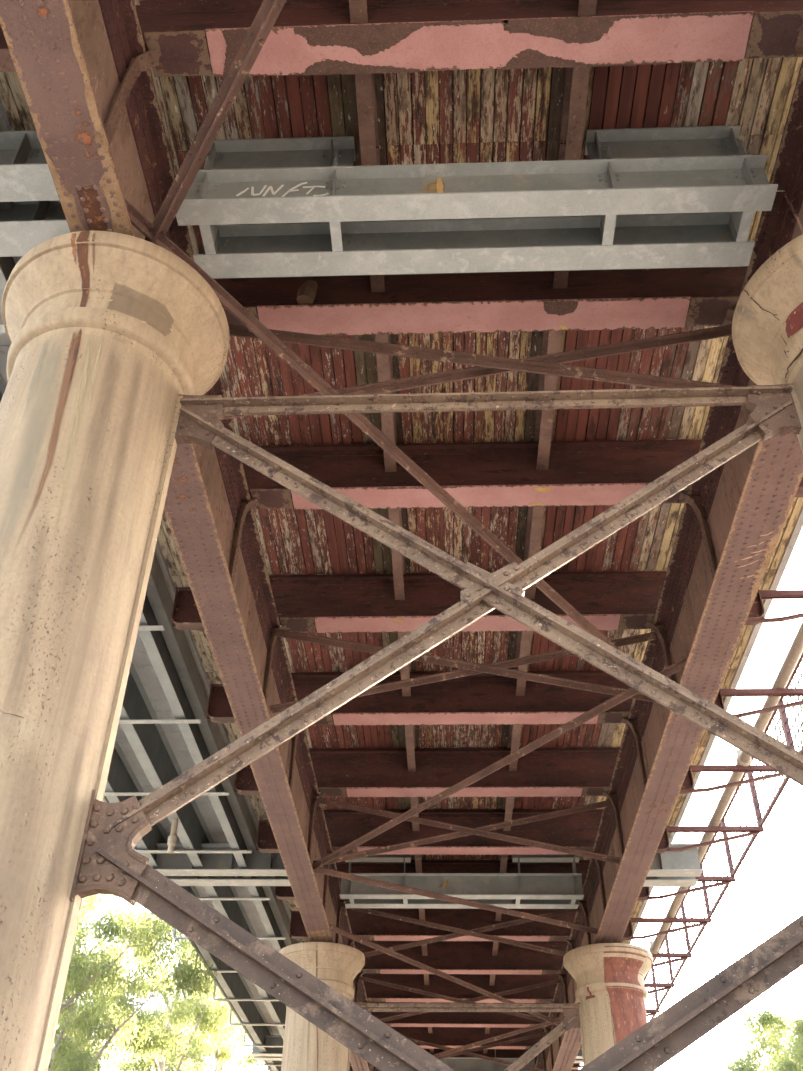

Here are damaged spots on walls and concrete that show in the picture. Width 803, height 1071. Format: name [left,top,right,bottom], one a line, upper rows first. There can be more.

peeling [221,29,248,78]
peeling [294,12,748,77]
crack [743,289,803,378]
corrosion [33,329,82,508]
peeling [586,946,648,1045]